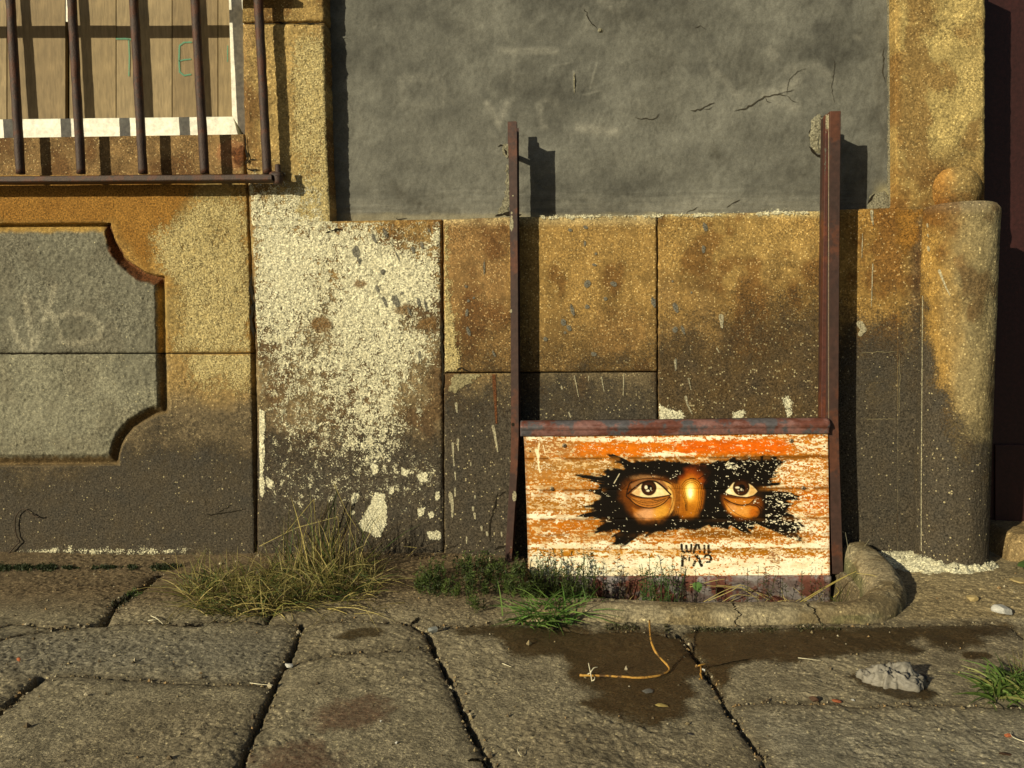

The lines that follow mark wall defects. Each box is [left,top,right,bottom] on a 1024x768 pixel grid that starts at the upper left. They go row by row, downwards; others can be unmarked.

crack [691,68,806,111]
peeling [148,26,480,538]
damp [0,284,819,558]
peeling [427,530,441,540]
damp [838,295,1000,575]